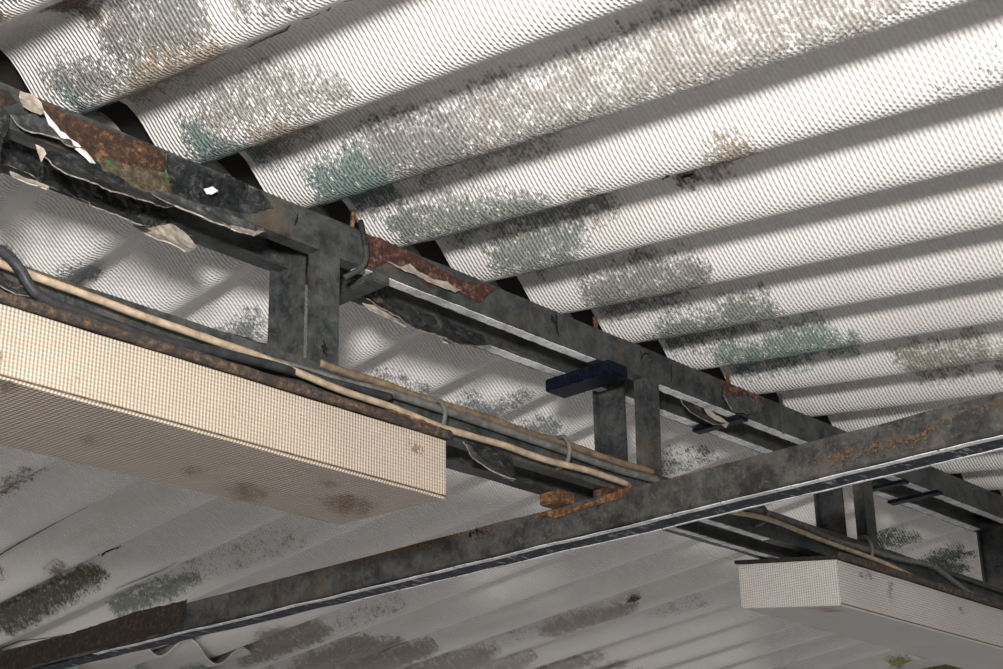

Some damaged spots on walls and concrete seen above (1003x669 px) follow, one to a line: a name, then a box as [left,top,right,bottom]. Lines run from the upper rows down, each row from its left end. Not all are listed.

rust [38,99,173,194]
peeling [0,0,934,383]
rust [362,236,497,303]
rust [805,416,951,469]
rust [334,485,633,575]